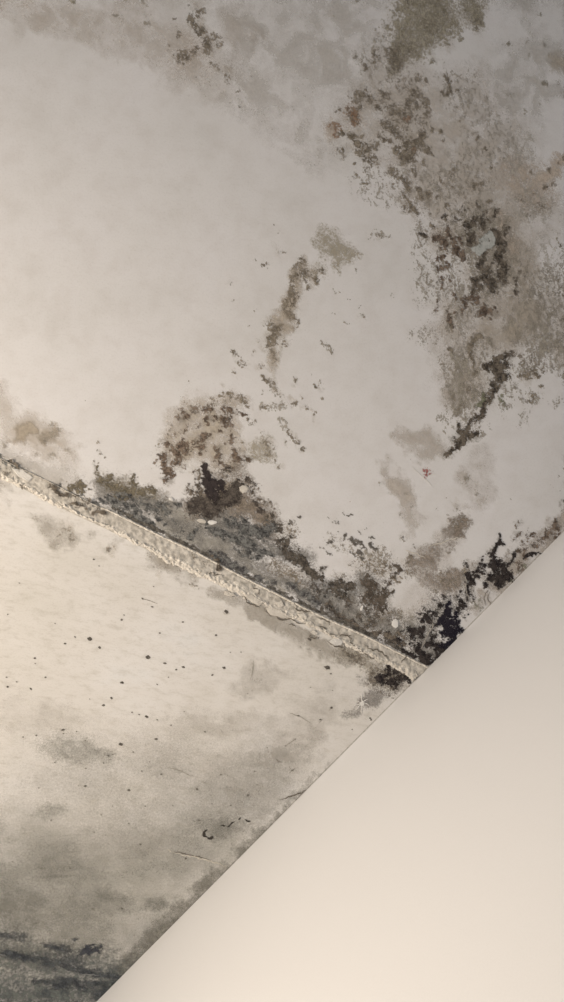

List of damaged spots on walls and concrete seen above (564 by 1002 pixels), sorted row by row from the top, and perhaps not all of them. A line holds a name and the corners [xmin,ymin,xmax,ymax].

water stain [112,0,564,458]
water stain [0,228,564,721]
water stain [0,860,230,999]